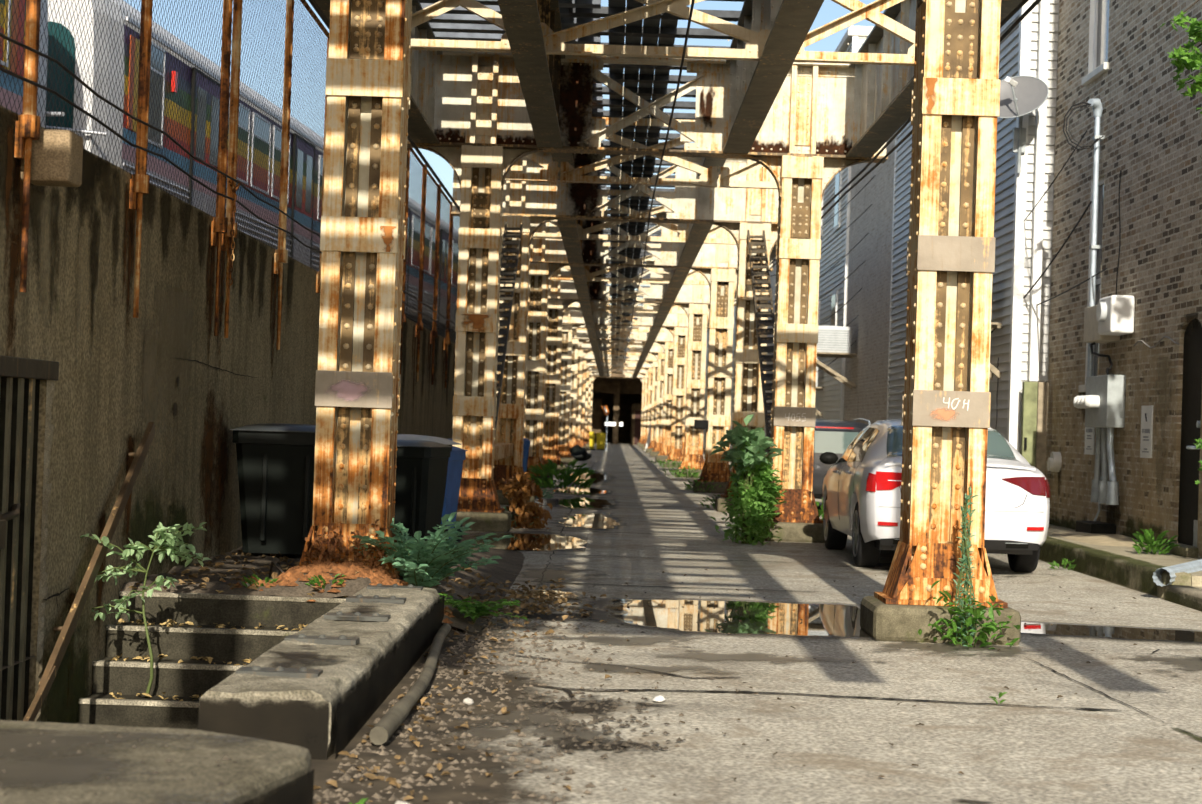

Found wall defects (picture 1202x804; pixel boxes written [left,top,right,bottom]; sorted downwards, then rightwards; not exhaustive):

rust [926,78,937,114]
damp [0,108,121,328]
damp [143,184,207,269]
damp [231,233,294,316]
rust [380,226,396,252]
rust [559,62,604,300]
rust [462,314,489,331]
rust [201,393,228,551]